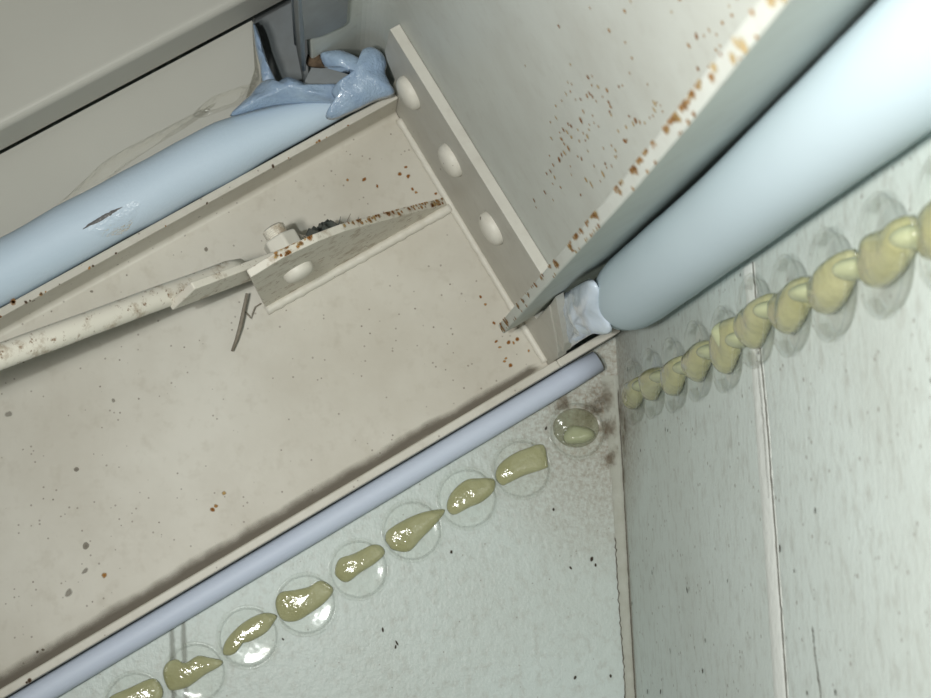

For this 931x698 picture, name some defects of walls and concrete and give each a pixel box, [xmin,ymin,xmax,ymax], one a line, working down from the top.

rust [544,75,623,201]
rust [584,29,748,195]
rust [274,235,312,258]
rust [567,211,600,252]
rust [493,259,559,348]